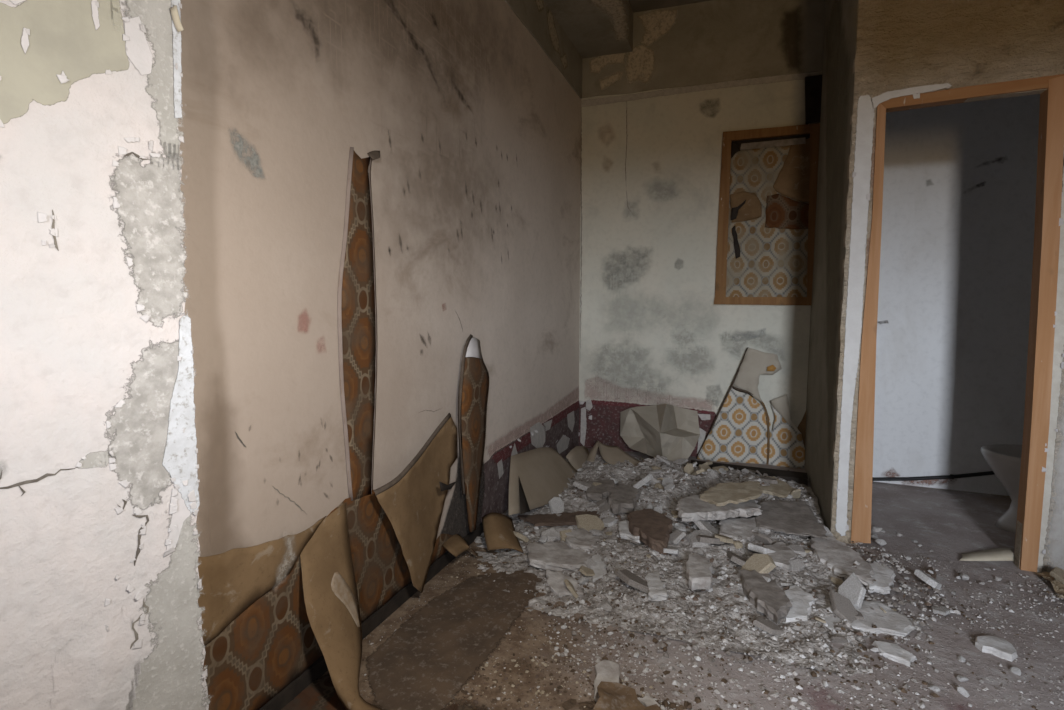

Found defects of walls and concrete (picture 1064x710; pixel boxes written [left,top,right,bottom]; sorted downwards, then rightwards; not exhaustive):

peeling [0,0,211,710]
crack [0,464,83,496]
peeling [441,433,485,538]
peeling [697,414,710,454]